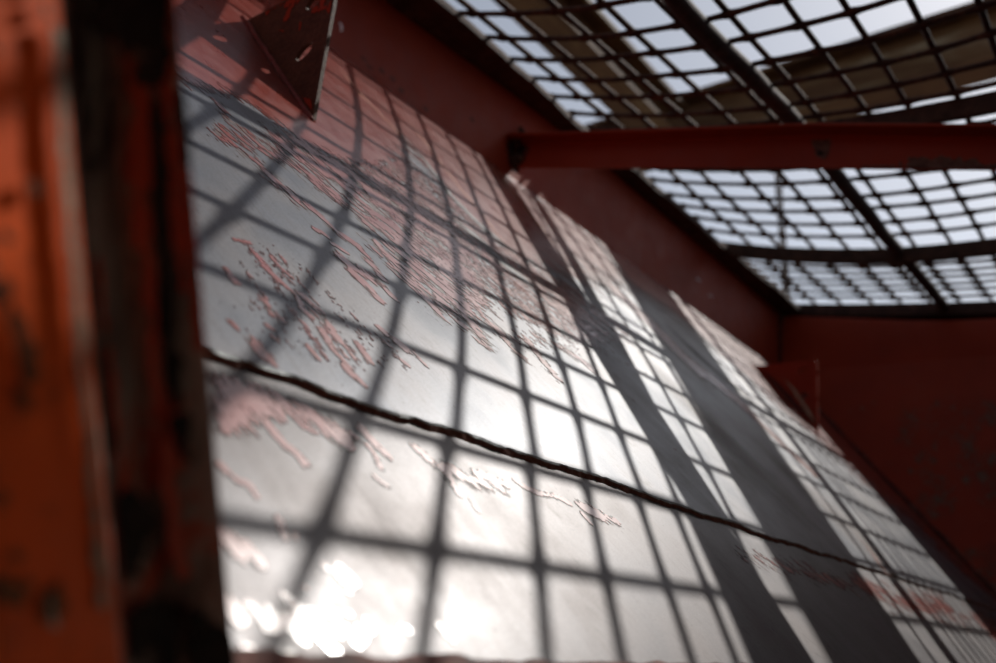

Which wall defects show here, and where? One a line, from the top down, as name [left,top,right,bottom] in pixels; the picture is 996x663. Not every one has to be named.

peeling [122,0,207,408]
peeling [206,96,822,489]
peeling [408,442,624,529]
peeling [222,524,268,573]
peeling [228,590,378,653]
peeling [433,621,459,645]